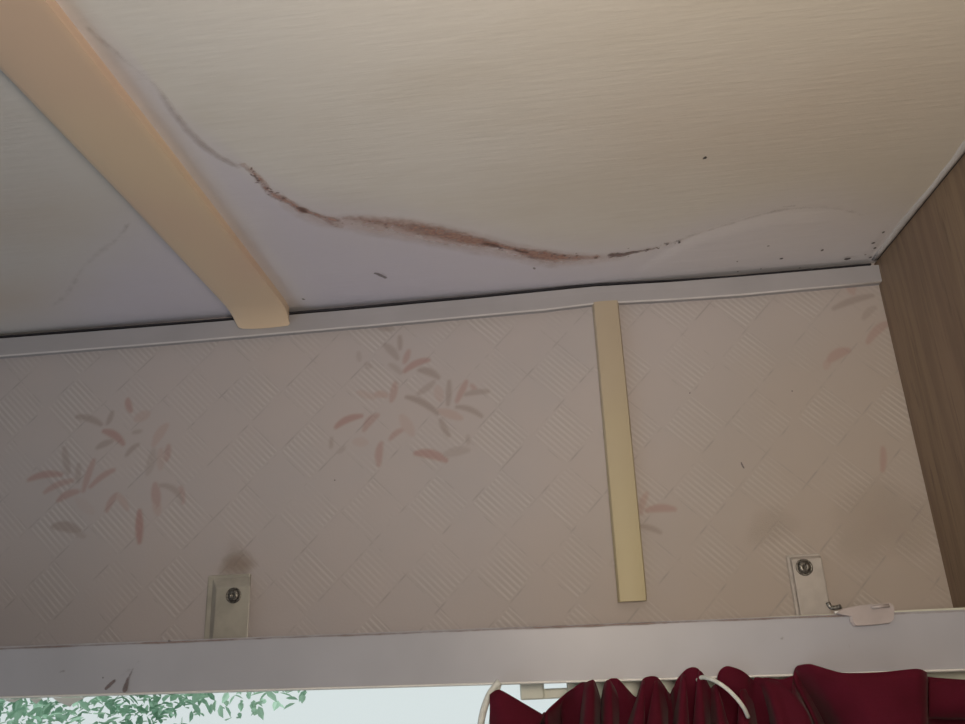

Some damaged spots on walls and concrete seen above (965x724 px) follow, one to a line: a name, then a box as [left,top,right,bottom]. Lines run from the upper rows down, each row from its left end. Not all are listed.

leakage [251,168,335,221]
leakage [413,226,581,260]
leakage [609,242,680,258]